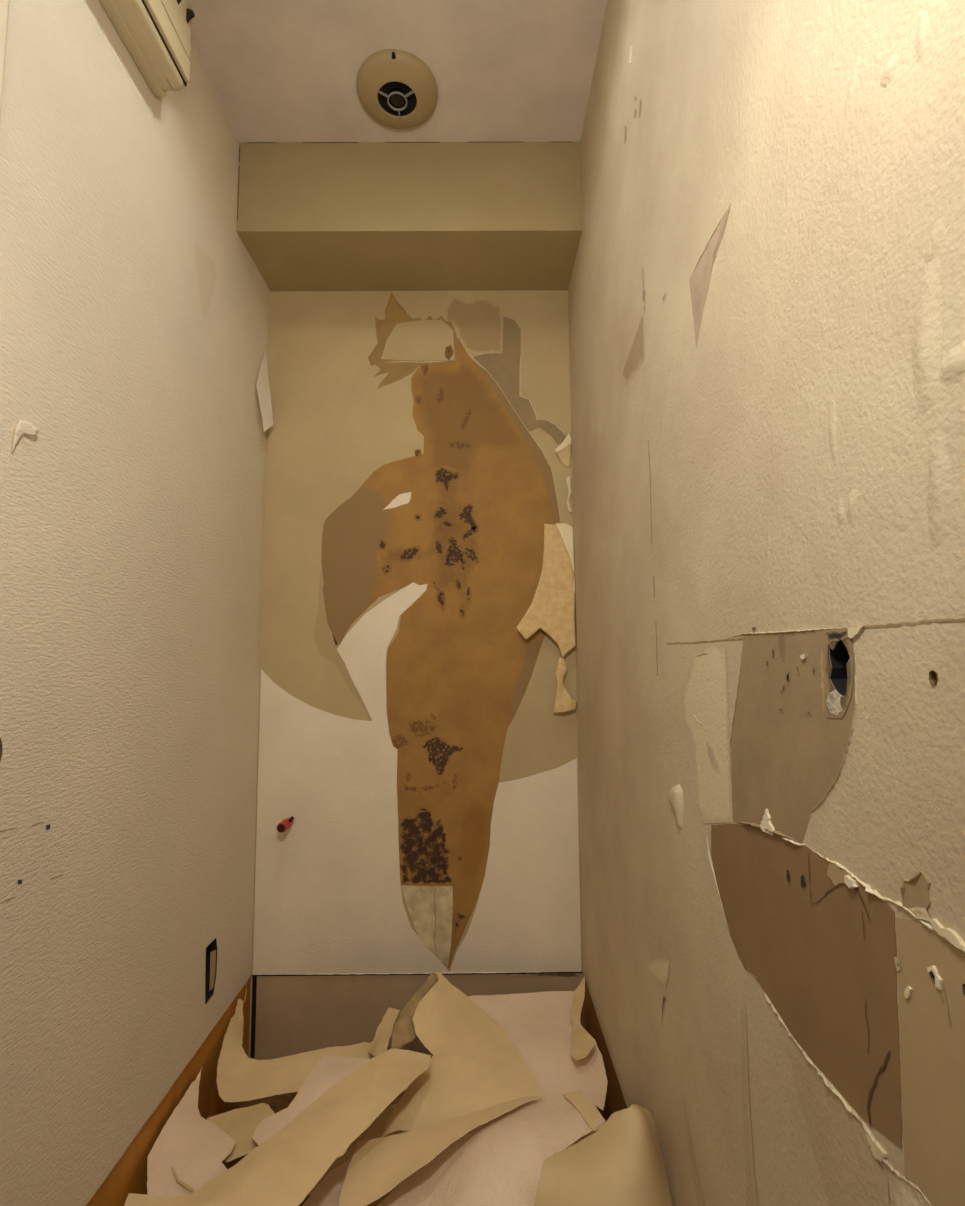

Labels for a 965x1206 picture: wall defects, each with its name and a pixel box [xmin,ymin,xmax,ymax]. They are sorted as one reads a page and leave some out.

peeling [689,204,731,349]
damp [379,467,480,619]
peeling [321,338,560,969]
damp [390,712,465,886]
peeling [730,626,864,842]
damp [453,909,469,938]
peeling [801,1049,851,1113]
peeling [865,1129,888,1162]
crack [865,998,890,1129]
peeling [895,870,965,1206]